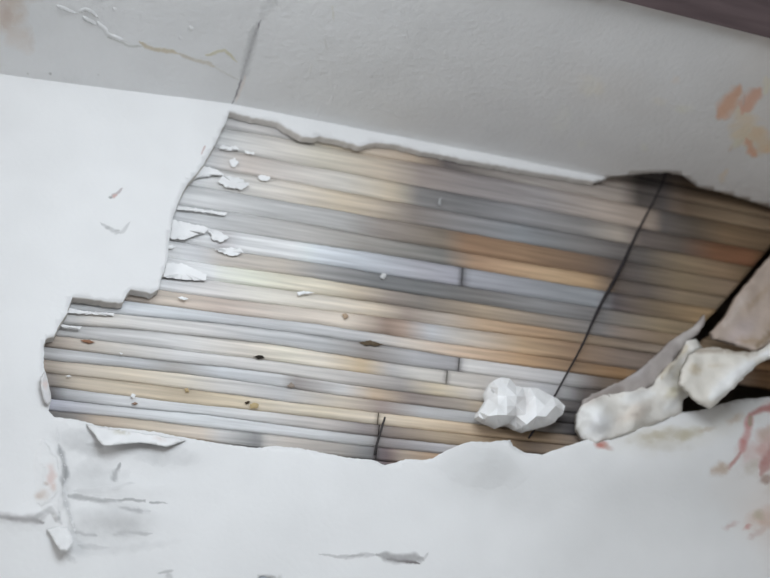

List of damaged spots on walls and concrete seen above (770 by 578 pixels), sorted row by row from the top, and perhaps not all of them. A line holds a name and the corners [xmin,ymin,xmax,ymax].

crack [58,0,280,104]
rust [714,75,770,158]
flaking render [40,111,595,465]
rust [705,397,770,486]
crack [0,443,168,550]
crack [318,550,429,566]
rust [720,503,770,541]